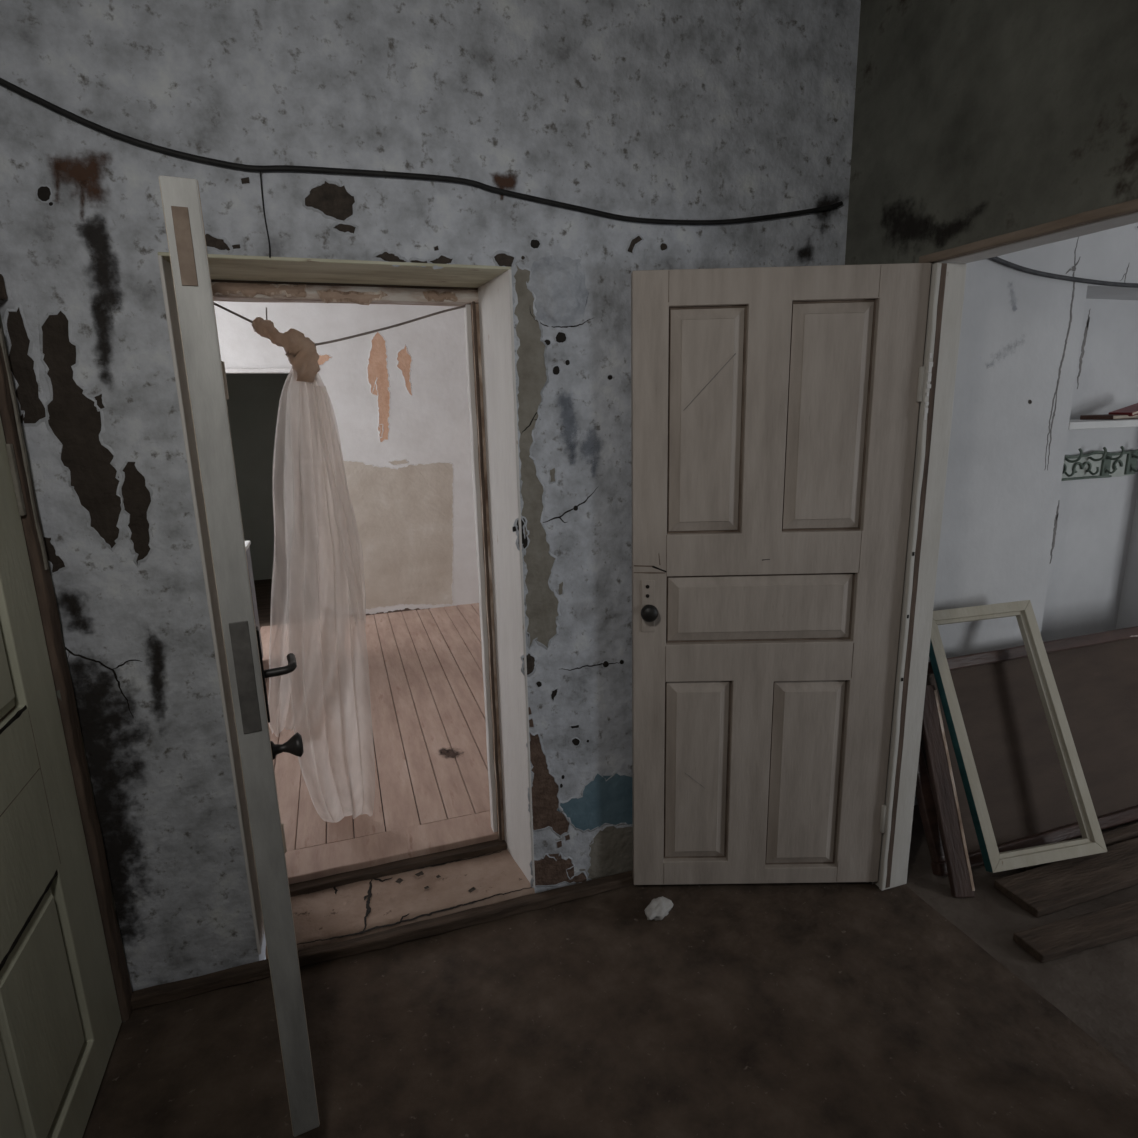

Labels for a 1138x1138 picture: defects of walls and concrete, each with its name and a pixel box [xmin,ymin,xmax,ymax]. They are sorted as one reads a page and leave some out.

flaking render [302,178,359,236]
peeling [3,302,155,574]
peeling [366,332,413,443]
peeling [492,239,570,702]
crack [543,487,598,523]
crack [1045,237,1090,470]
flaking render [526,706,633,888]
crack [297,851,532,945]